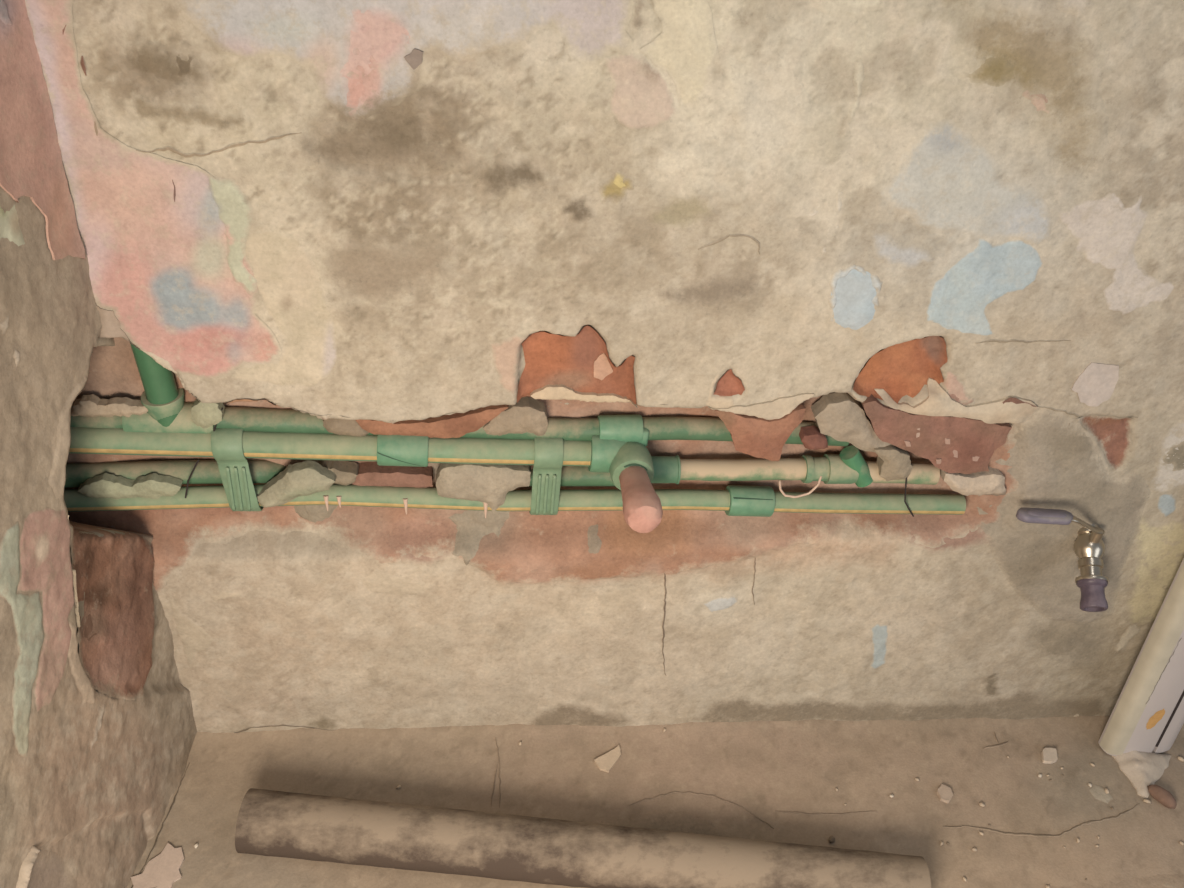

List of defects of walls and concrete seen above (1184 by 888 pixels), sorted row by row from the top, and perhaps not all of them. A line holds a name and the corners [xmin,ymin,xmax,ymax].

water stain [291,104,552,200]
water stain [558,171,636,225]
water stain [313,230,460,314]
peeling [1056,192,1175,316]
spalling [0,0,1038,757]
flaking render [1071,362,1133,471]
crack [660,573,668,675]
crack [629,791,877,829]
crack [943,804,1139,837]